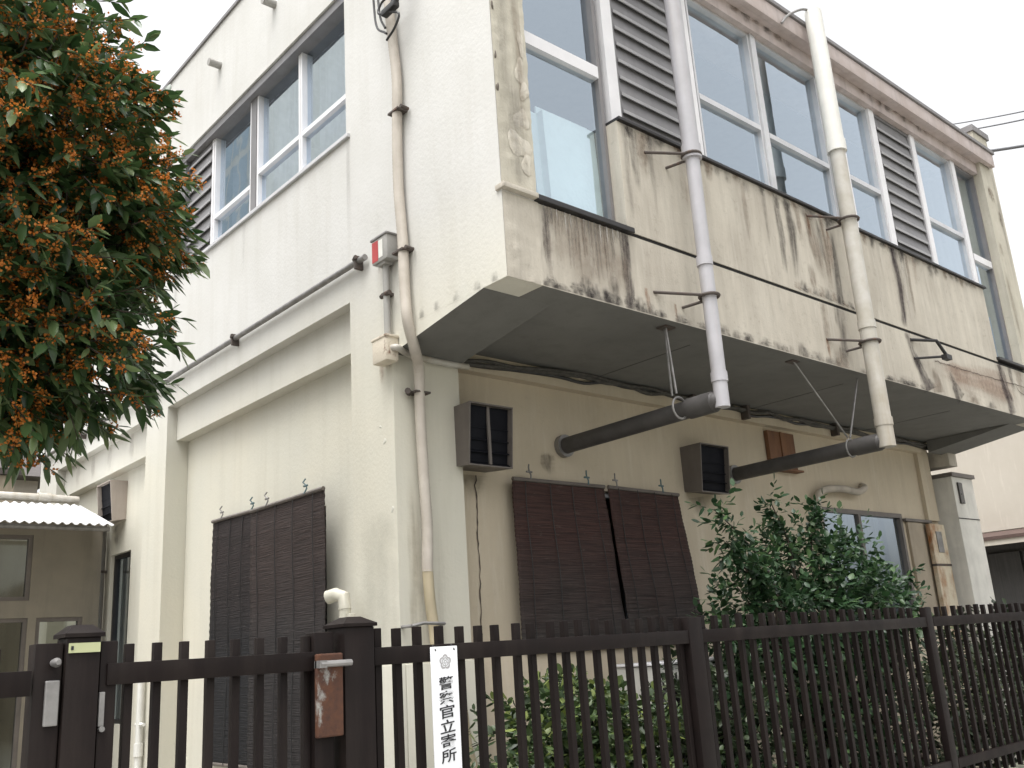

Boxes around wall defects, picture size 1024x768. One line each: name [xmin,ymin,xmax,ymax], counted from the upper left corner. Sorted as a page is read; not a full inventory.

damp [547,208,663,317]
damp [863,235,906,321]